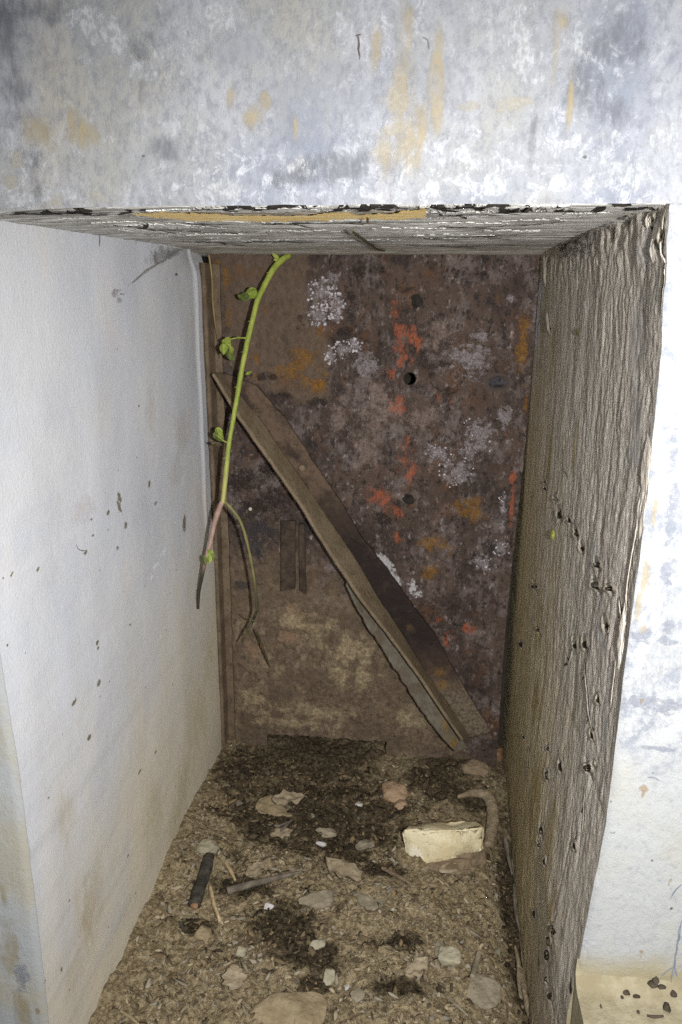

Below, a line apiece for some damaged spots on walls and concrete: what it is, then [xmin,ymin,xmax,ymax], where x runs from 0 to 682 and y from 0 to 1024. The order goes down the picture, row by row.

peeling [583,121,680,194]
peeling [58,154,636,259]
spalling [649,212,664,243]
rust [228,461,293,557]